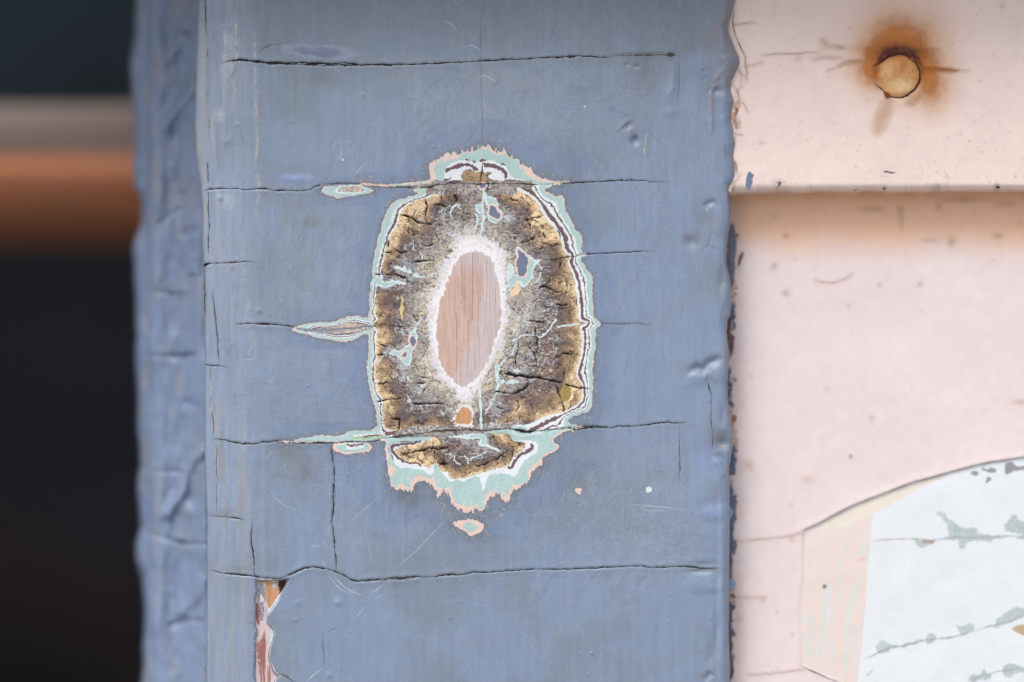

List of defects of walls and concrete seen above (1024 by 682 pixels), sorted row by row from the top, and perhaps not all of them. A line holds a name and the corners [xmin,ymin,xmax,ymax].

crack [205,3,609,67]
corrosion [860,20,947,99]
crack [167,87,717,582]
peeling [798,457,1024,682]
peeling [252,578,288,682]